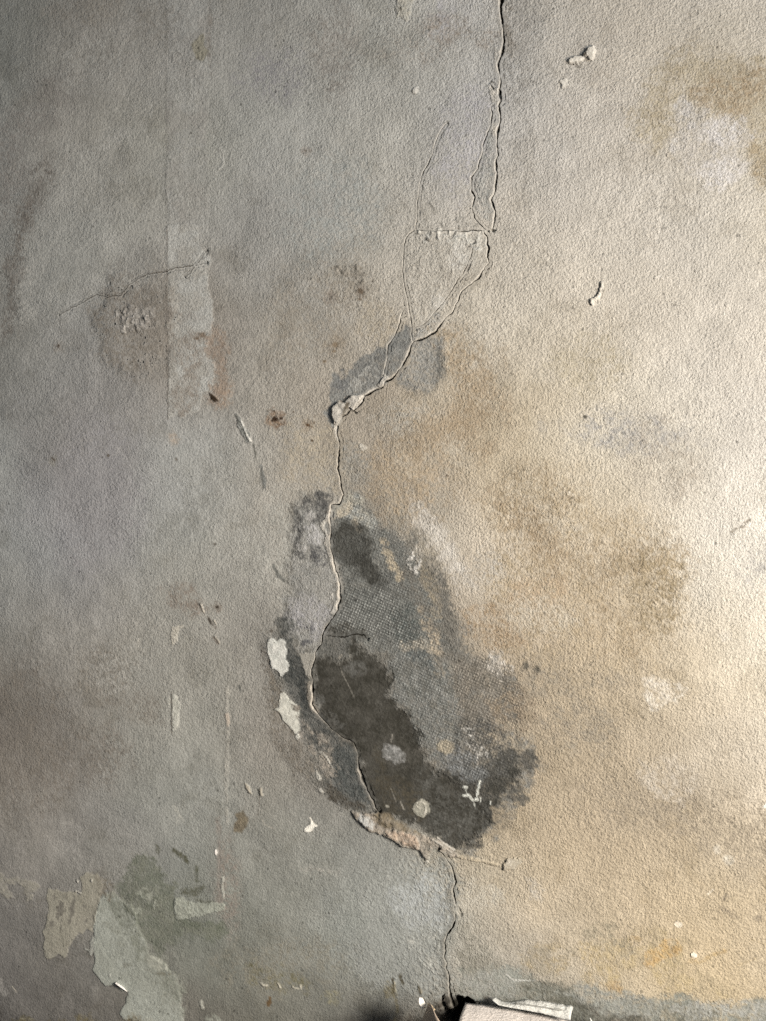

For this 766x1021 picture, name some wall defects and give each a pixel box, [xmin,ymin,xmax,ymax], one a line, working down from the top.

damp [621,35,766,217]
crack [59,250,208,317]
crack [307,0,509,814]
damp [355,307,702,712]
peeling [303,816,318,833]
peeling [314,750,334,794]
damp [370,744,428,822]
spalling [351,804,460,863]
damp [635,751,701,810]
peeling [0,870,225,1021]
crack [437,849,461,1009]
damp [453,918,766,1021]